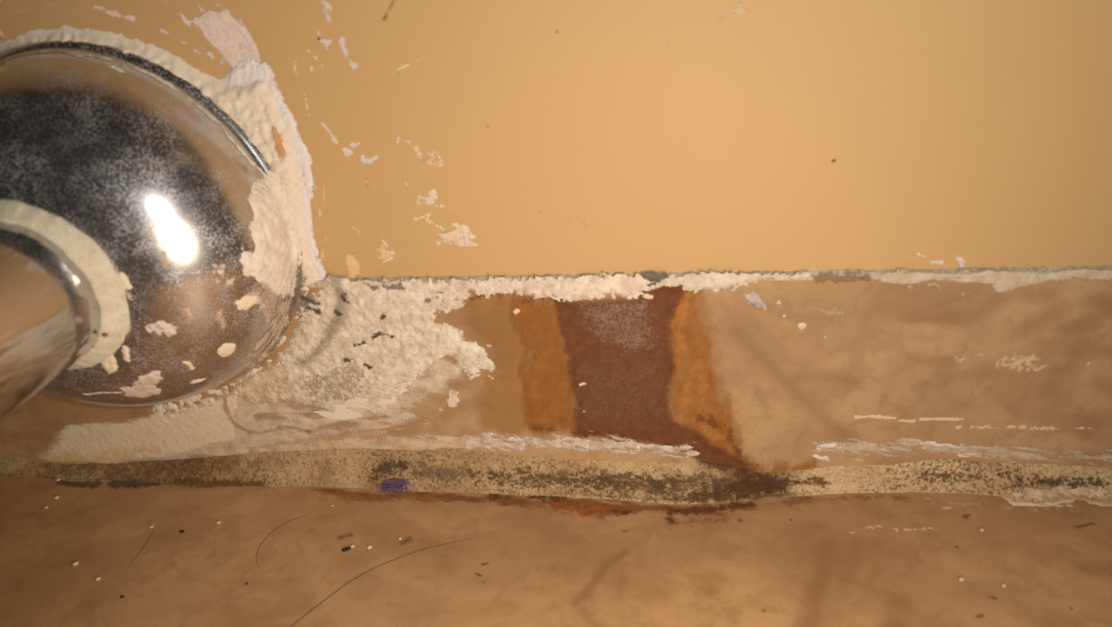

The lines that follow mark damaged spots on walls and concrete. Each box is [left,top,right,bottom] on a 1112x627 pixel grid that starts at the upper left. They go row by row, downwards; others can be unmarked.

peeling [306,0,359,71]
peeling [272,128,286,158]
peeling [342,141,378,164]
peeling [916,252,965,268]
peeling [364,270,811,313]
rust [471,284,815,474]
leakage [255,405,406,440]
leakage [57,477,264,489]
leakage [368,460,831,503]
mould [921,465,1112,501]